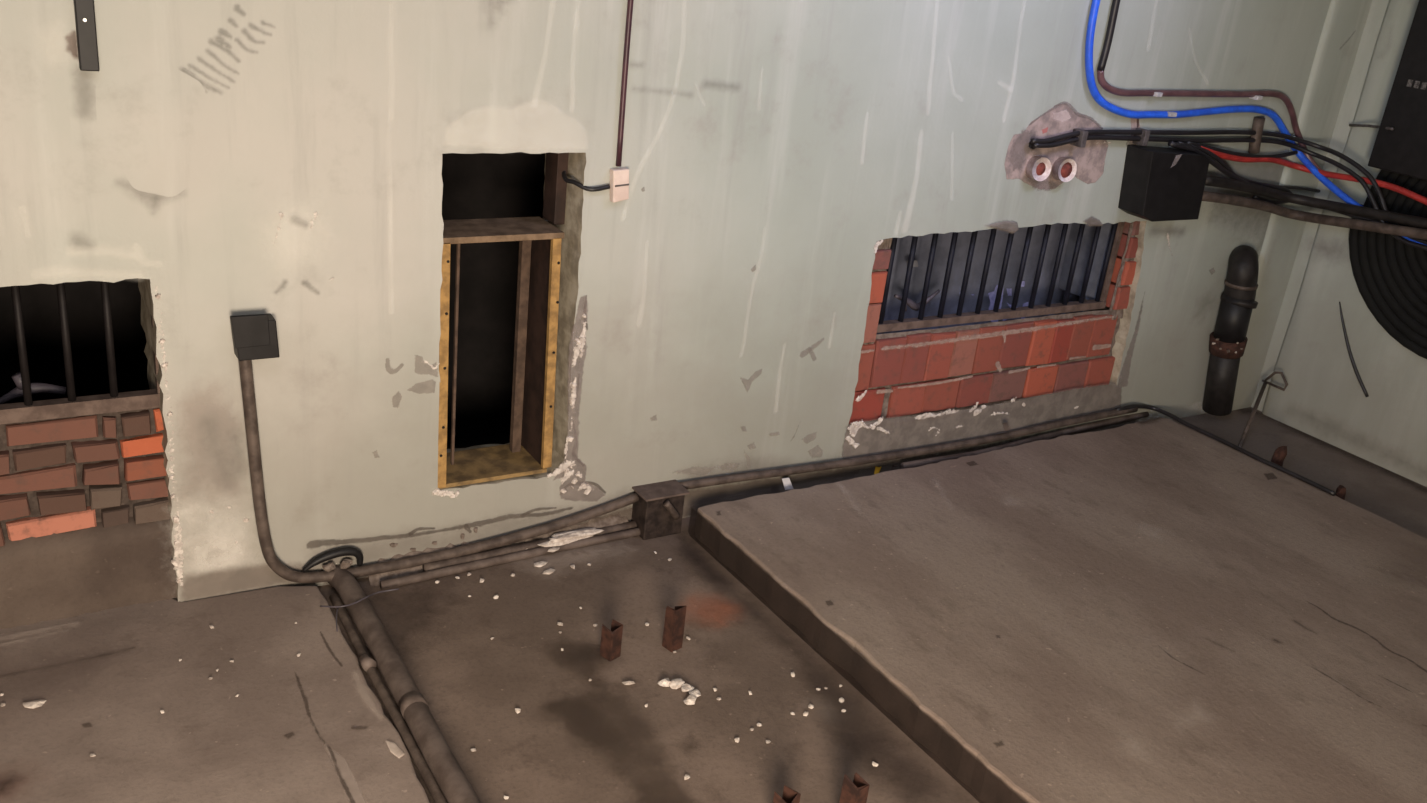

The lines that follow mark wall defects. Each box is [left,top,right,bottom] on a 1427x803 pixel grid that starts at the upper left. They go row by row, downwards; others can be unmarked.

flaking render [1005,102,1140,191]
flaking render [547,295,606,502]
crack [1273,601,1427,704]